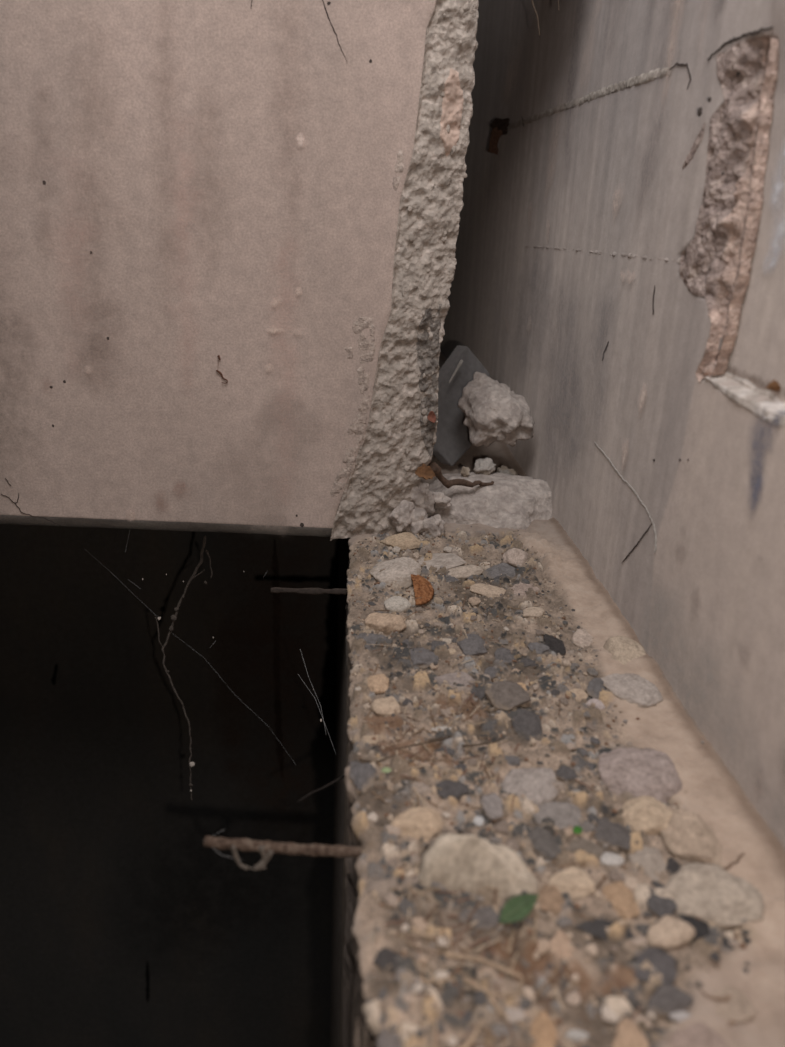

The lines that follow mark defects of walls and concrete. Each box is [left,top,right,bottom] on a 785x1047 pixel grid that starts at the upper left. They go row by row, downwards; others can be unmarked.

crack [322,0,347,61]
spalling [679,35,785,428]
spalling [330,0,479,541]
spalling [384,596,412,613]
spalling [569,688,605,710]
peeling [473,793,503,827]
peeling [600,852,625,867]
spalling [669,1011,691,1022]
peeling [565,1029,590,1044]